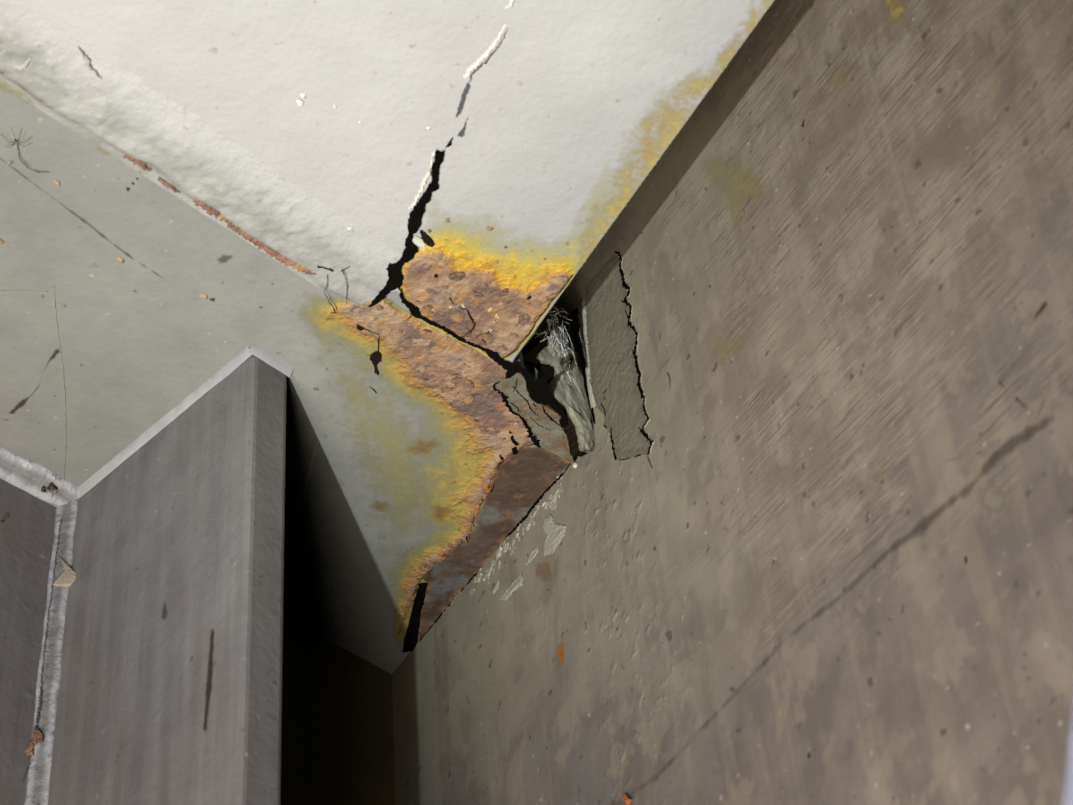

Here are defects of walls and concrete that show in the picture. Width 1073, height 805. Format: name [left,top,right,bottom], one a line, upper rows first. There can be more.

corrosion [685,50,735,95]
corrosion [746,0,773,32]
crack [317,24,670,548]
corrosion [307,106,694,641]
spalling [575,256,650,459]
spalling [414,333,577,643]
crack [402,573,477,653]